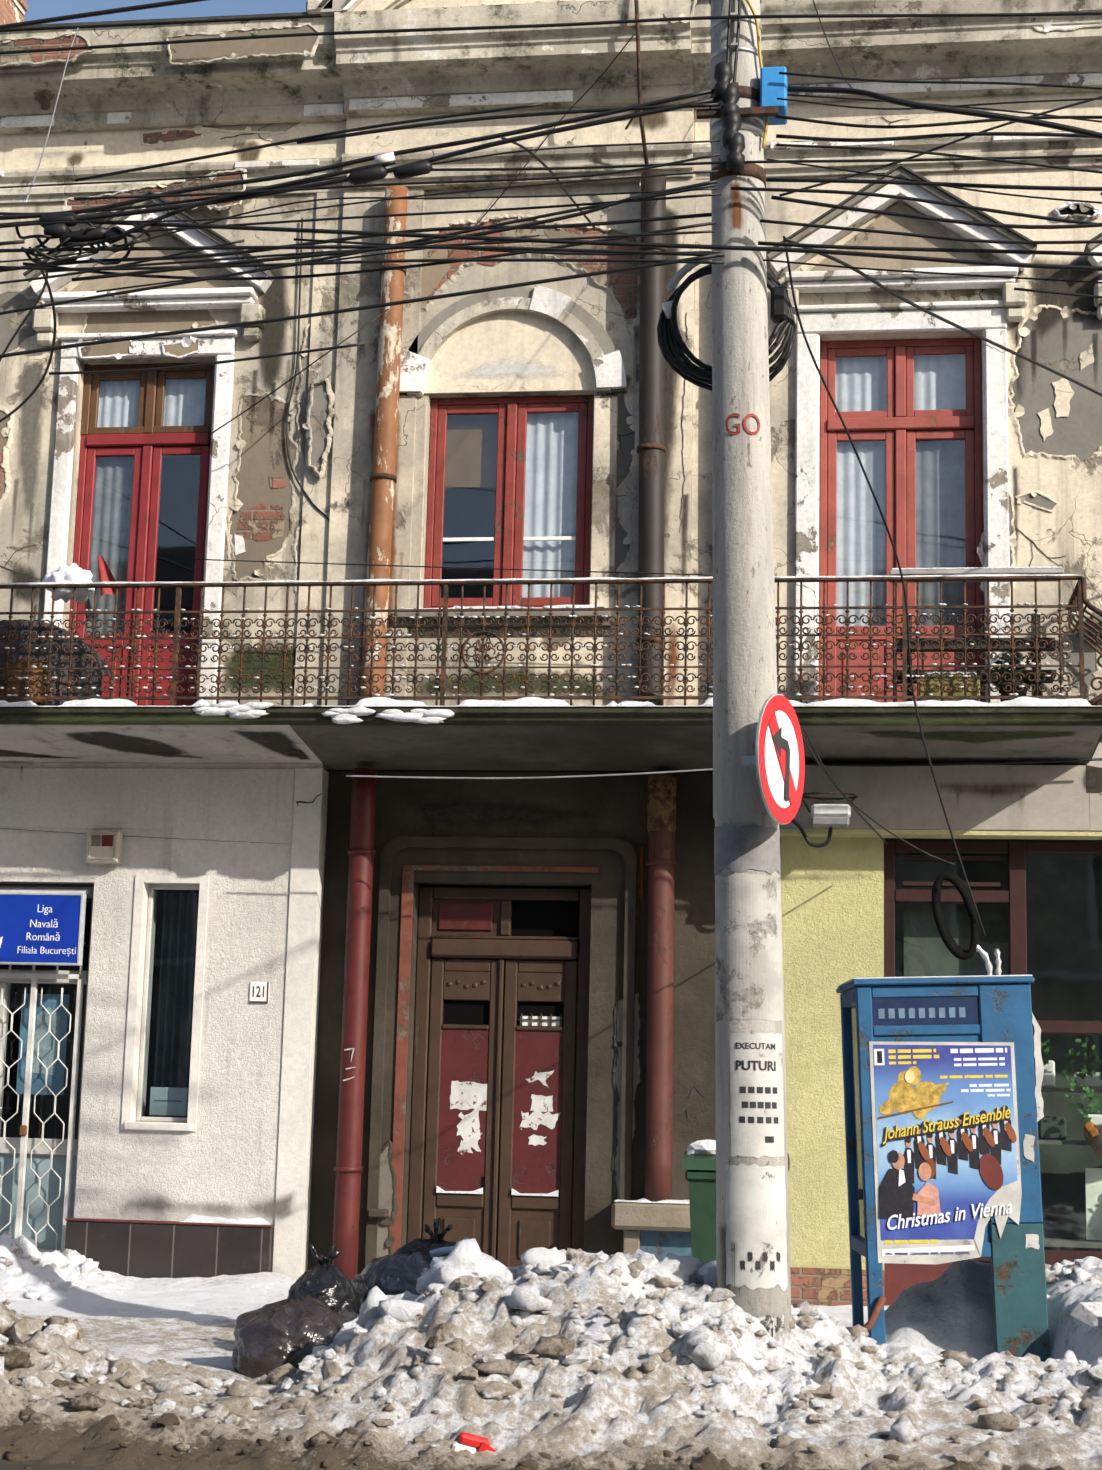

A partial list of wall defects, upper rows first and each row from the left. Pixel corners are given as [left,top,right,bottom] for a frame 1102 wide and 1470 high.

spalling [0,30,95,68]
spalling [140,122,305,148]
spalling [62,168,247,215]
flaking render [420,213,638,325]
flaking render [0,287,45,361]
flaking render [1008,305,1102,468]
flaking render [0,405,14,514]
flaking render [223,321,311,619]
rust [384,418,399,689]